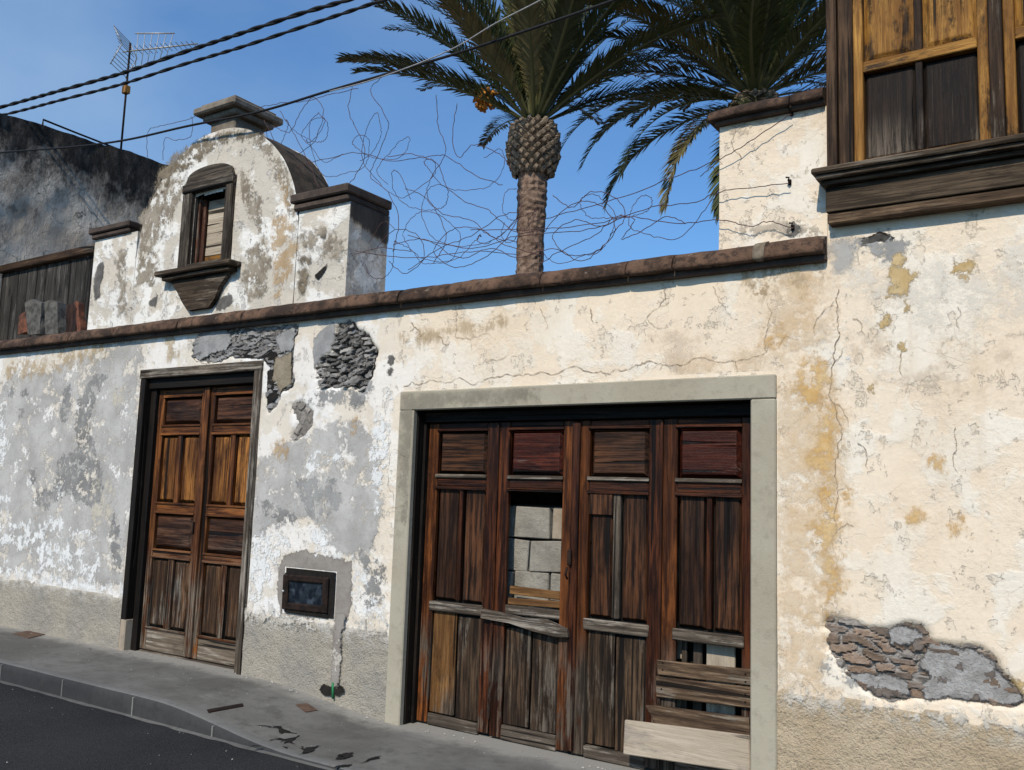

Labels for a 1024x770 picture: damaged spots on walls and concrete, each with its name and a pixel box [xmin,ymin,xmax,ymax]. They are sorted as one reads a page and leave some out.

peeling [0,340,144,597]
spalling [215,295,233,311]
peeling [191,320,395,625]
crack [403,289,874,559]
leakage [777,377,1024,734]
spalling [809,616,1024,707]